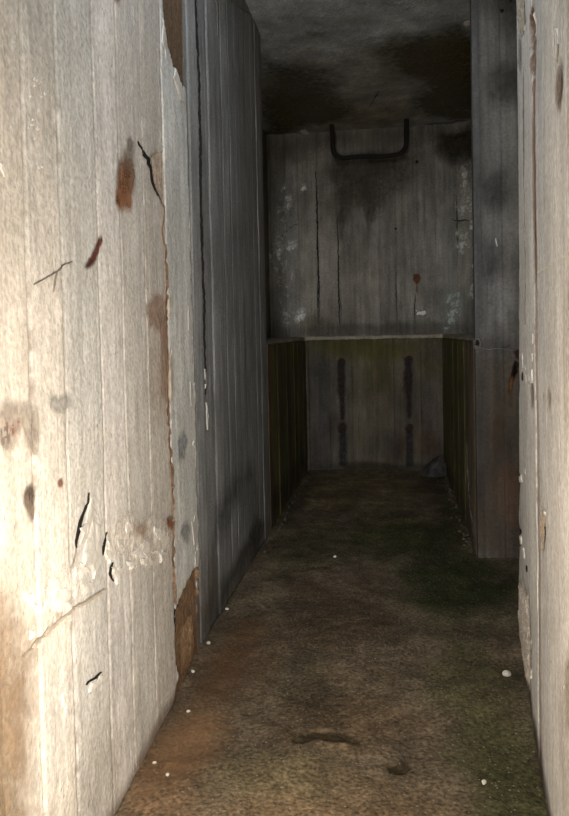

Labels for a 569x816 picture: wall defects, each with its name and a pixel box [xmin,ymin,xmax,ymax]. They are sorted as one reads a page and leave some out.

rust [117,139,135,209]
crack [195,0,252,395]
leakage [261,64,350,134]
leakage [384,20,473,254]
rust [87,237,103,268]
leakage [269,184,306,324]
crack [137,141,177,605]
rust [337,362,347,466]
rust [509,350,519,392]
peeling [110,514,173,570]
spalling [173,513,200,703]
crack [85,672,104,692]